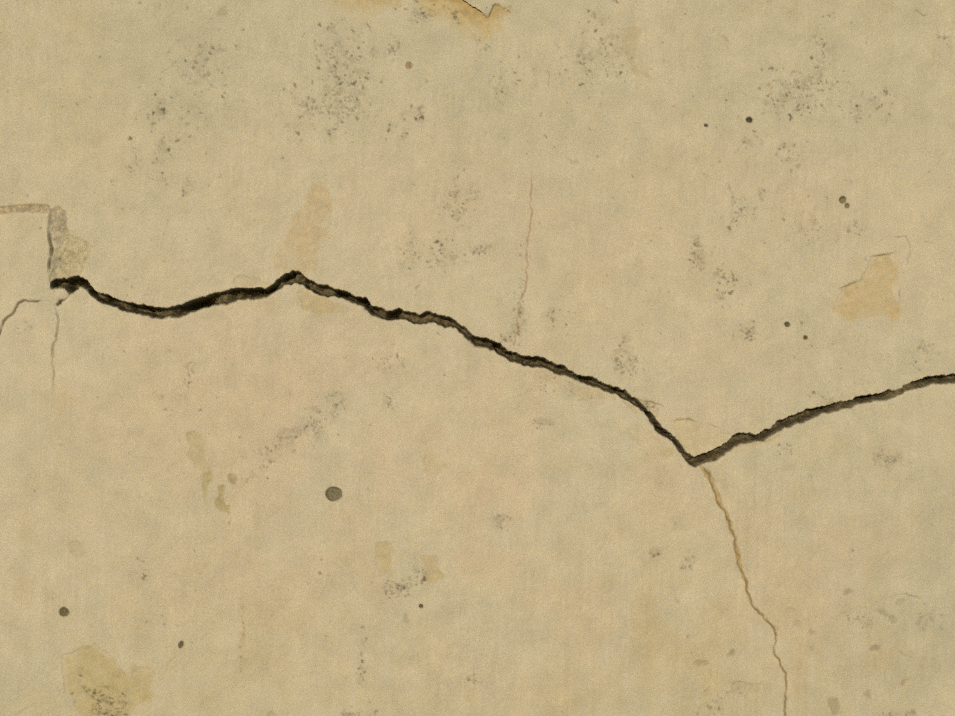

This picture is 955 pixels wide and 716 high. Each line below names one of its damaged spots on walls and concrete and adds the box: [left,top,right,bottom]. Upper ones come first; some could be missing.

peeling [325,0,513,44]
flaking render [47,205,93,283]
peeling [830,252,903,323]
crack [0,177,955,716]
peeling [62,644,155,716]